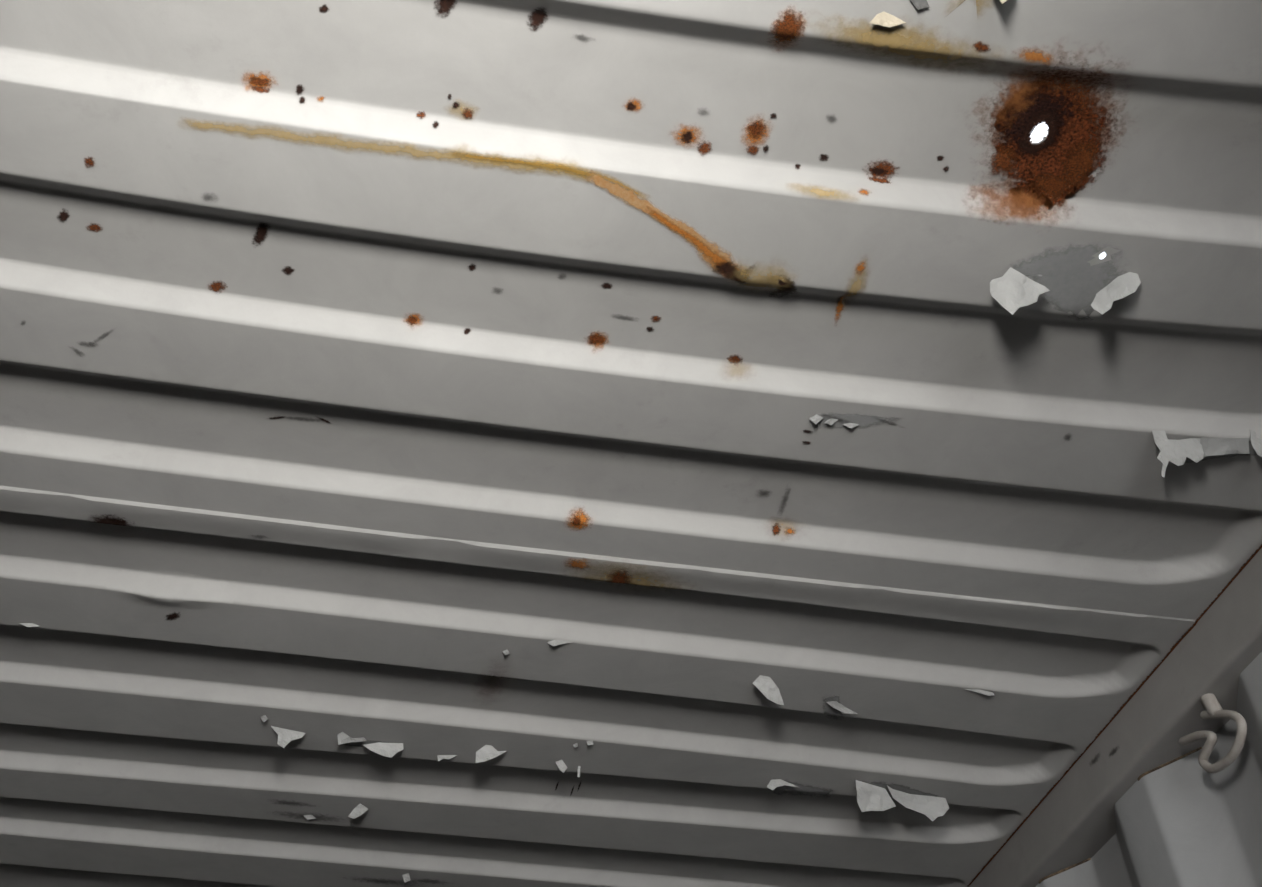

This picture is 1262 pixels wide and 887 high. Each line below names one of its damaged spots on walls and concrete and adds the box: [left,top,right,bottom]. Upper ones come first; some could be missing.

peeling [870,12,905,27]
rust [850,30,990,65]
rust [244,72,271,93]
rust [448,94,472,118]
rust [189,121,796,295]
peeling [990,245,1141,319]
peeling [1152,429,1262,478]
rust [568,512,587,529]
peeling [753,675,784,705]
rust [967,544,1262,886]
peeling [338,732,403,758]
peeling [855,780,949,822]